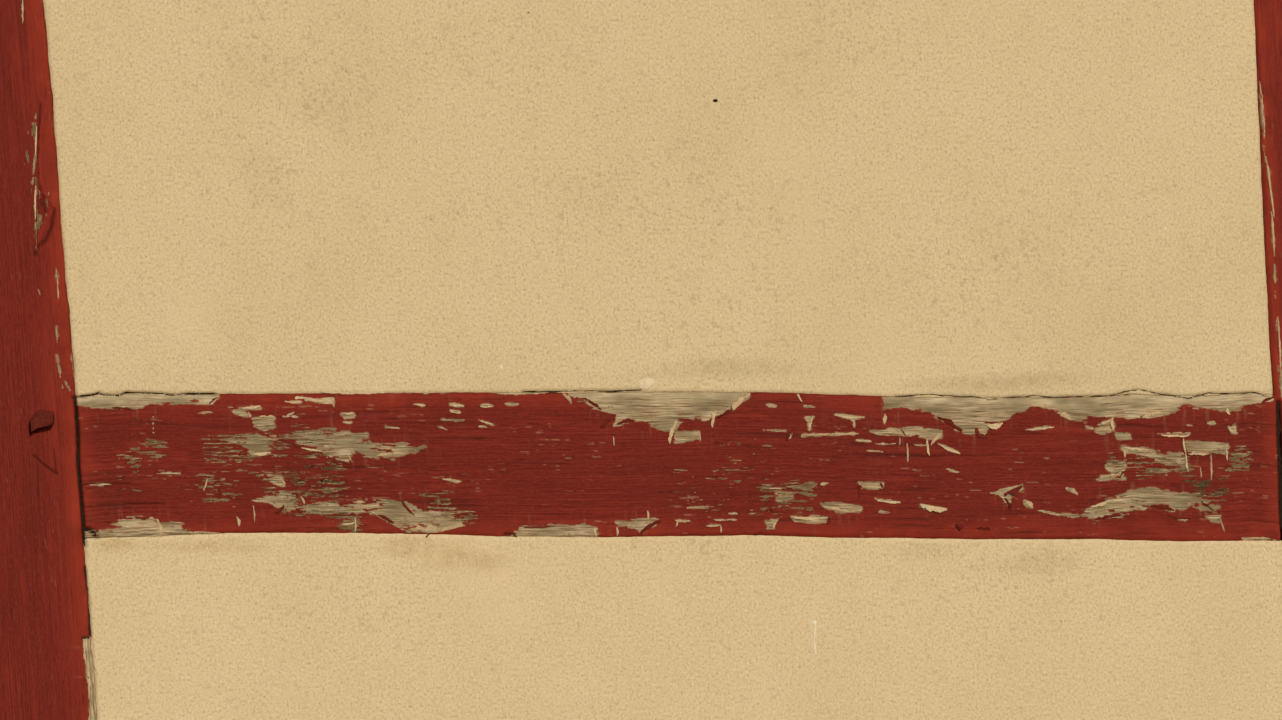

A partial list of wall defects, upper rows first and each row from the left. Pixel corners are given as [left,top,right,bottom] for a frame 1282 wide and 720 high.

peeling [479,393,545,428]
peeling [562,392,751,445]
peeling [56,353,478,538]
peeling [615,442,901,536]
peeling [504,523,598,537]